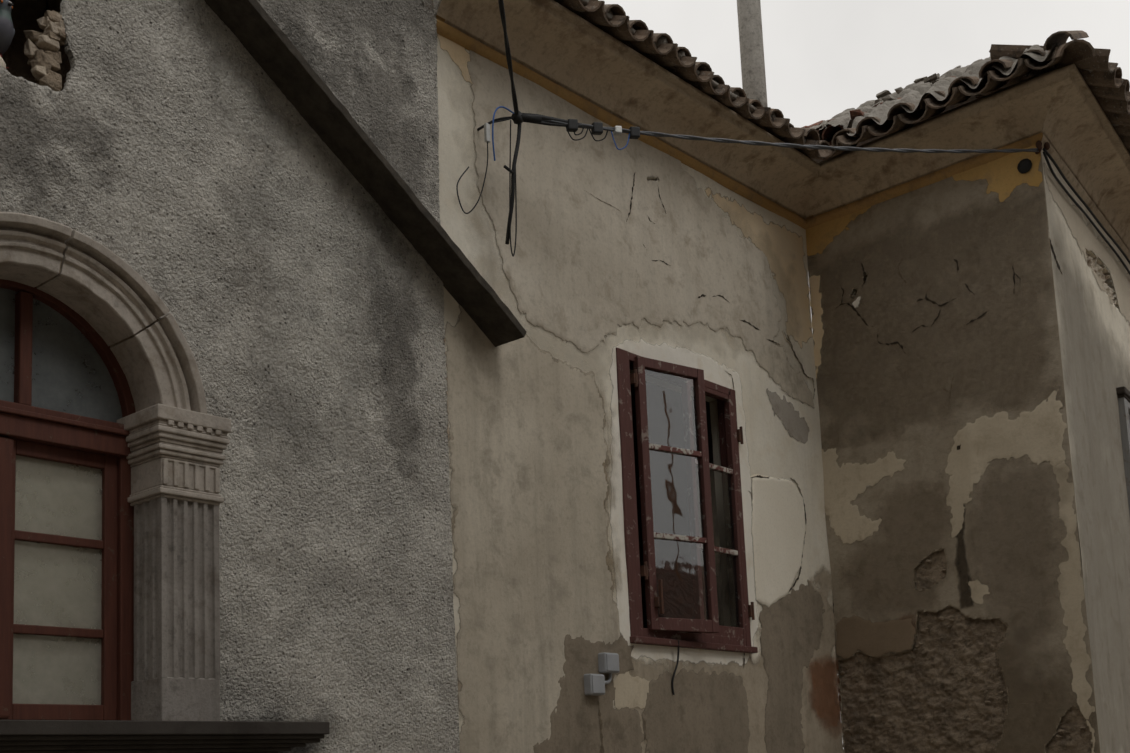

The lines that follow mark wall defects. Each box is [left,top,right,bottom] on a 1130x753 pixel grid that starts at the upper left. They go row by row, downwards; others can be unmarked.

flaking render [437,34,1008,753]
crack [698,294,815,399]
crack [836,259,987,354]
flaking render [945,389,1095,753]